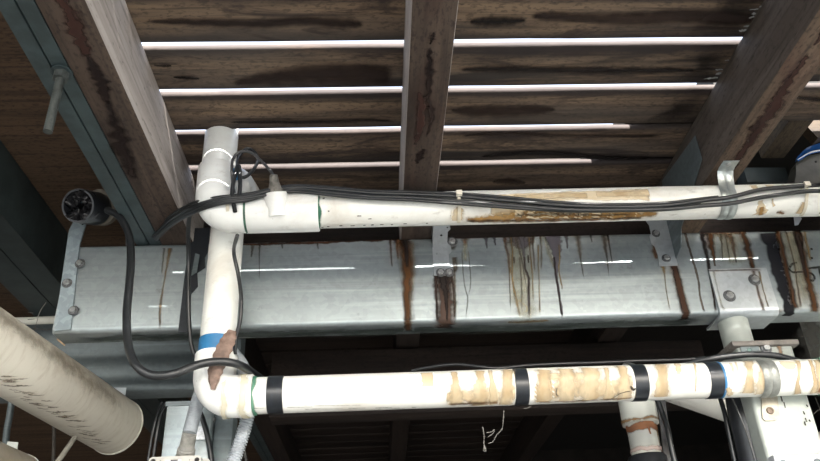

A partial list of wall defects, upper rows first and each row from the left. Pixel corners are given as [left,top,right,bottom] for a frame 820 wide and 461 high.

water stain [86,56,136,178]
corrosion [243,239,414,330]
corrosion [433,238,471,328]
corrosion [652,246,690,320]
corrosion [775,230,819,312]